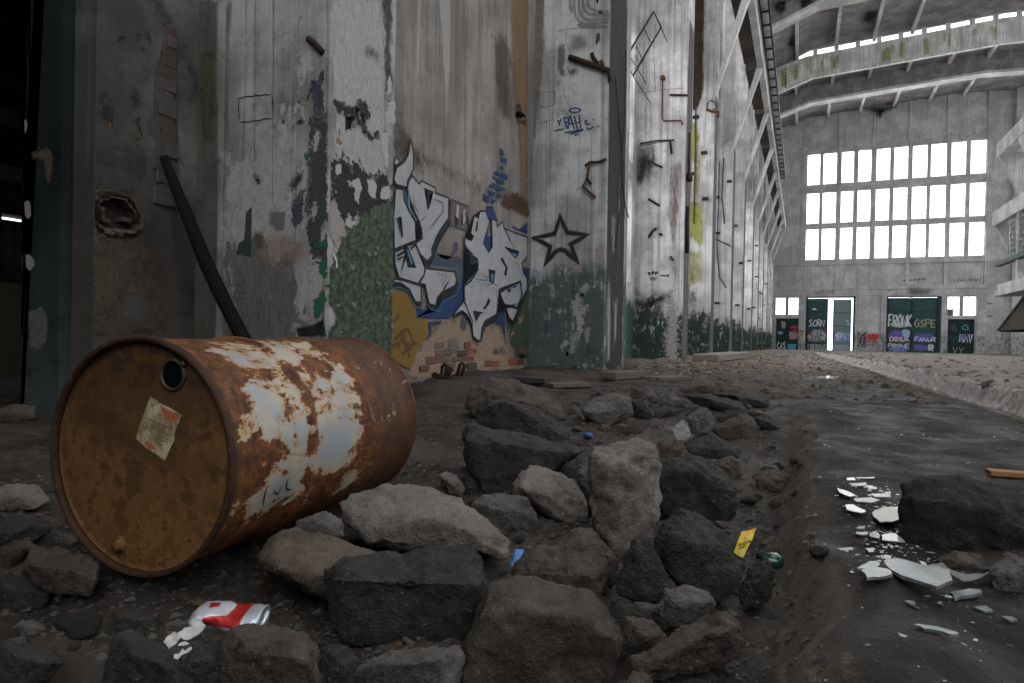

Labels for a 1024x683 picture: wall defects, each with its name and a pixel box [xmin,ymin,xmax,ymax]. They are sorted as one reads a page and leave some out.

spalling [95,192,146,240]
flaking render [118,24,178,210]
peeling [222,0,396,355]
spalling [407,276,530,381]